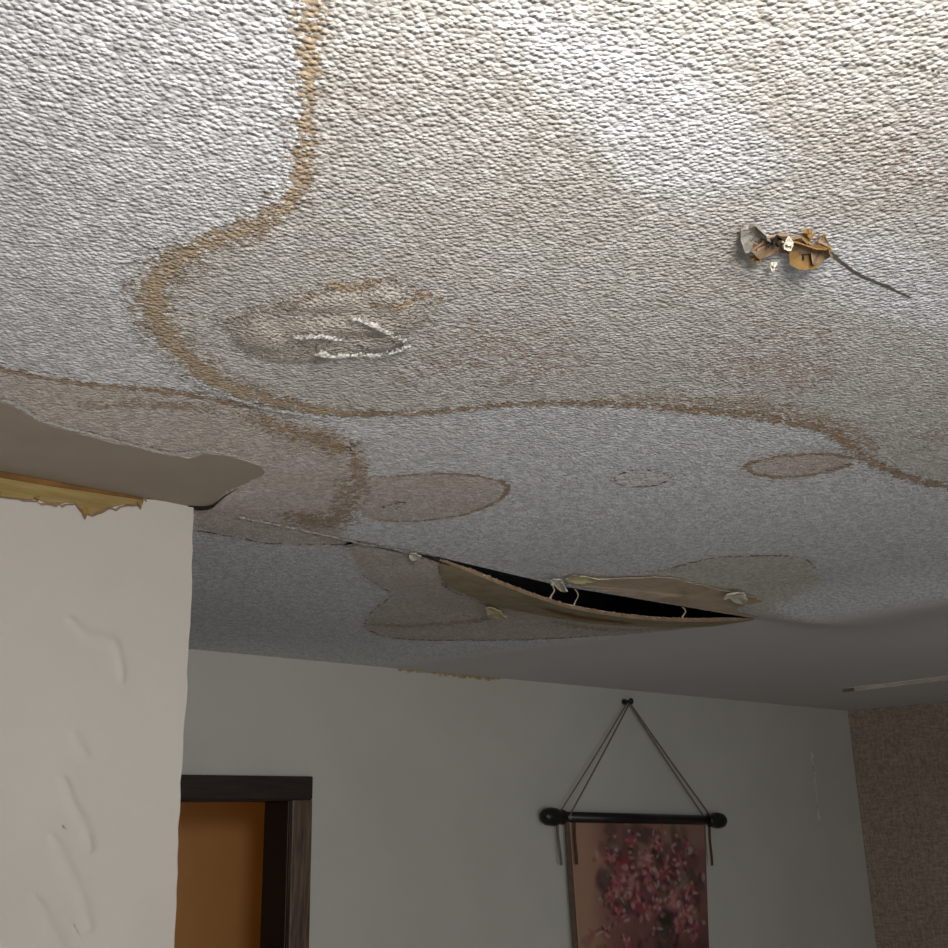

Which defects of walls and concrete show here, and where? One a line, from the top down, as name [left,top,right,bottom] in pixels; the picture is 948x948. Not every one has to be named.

spalling [740,223,911,298]
water stain [0,0,948,642]
peeling [177,376,306,416]